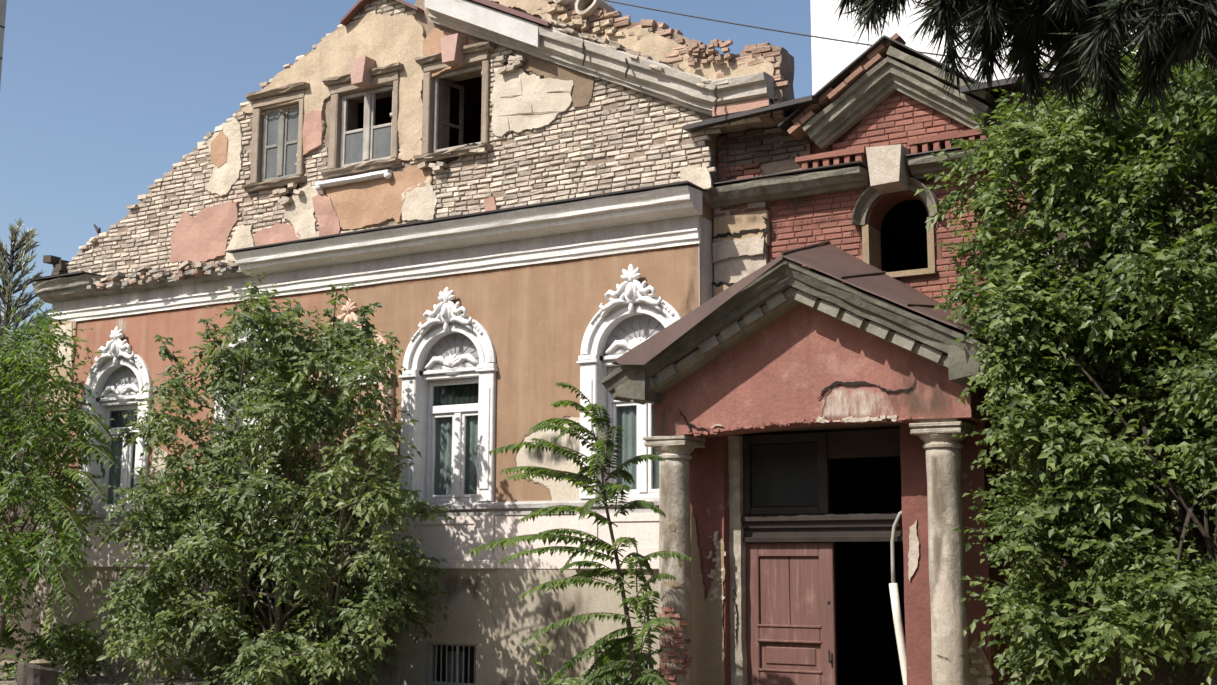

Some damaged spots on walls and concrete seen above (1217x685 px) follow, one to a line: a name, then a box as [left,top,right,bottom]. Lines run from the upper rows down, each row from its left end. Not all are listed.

flaking render [43,0,815,281]
peeling [513,415,590,501]
crack [679,409,722,436]
crack [816,380,916,424]
peeling [707,531,726,601]
flaking render [657,607,692,685]
flaking render [940,573,993,685]